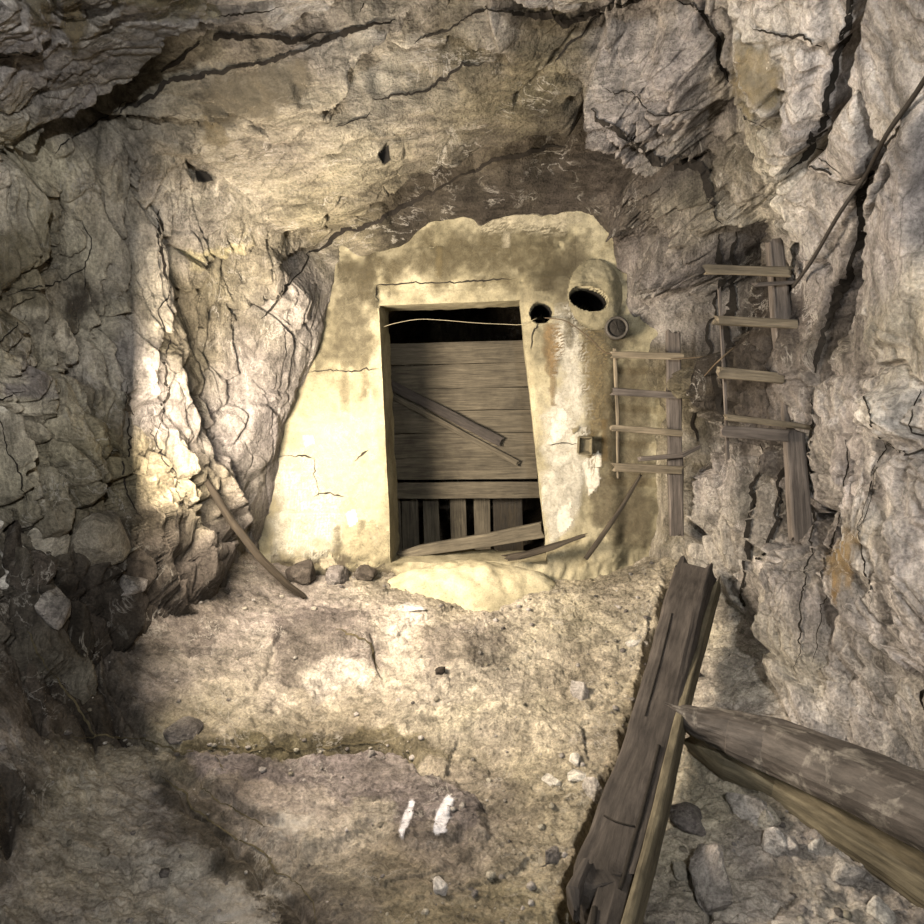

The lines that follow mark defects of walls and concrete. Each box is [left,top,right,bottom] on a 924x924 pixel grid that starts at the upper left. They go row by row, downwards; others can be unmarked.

leakage [287,396,377,576]
leakage [317,212,656,544]
peeling [542,307,611,542]